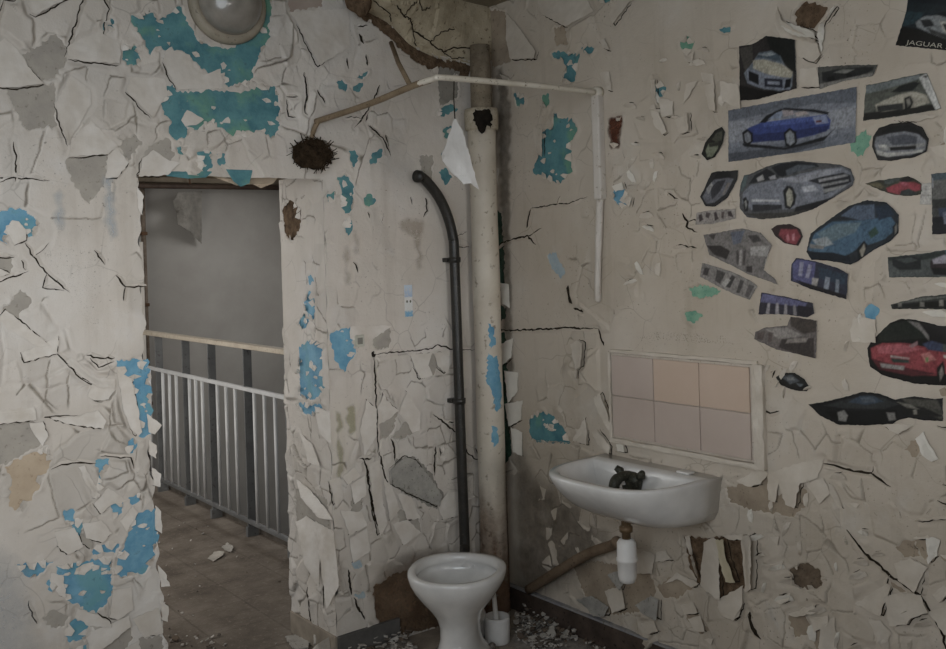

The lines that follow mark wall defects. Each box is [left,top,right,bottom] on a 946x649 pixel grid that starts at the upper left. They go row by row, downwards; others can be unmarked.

flaking render [362,13,470,77]
peeling [0,0,282,214]
corrosion [608,116,622,148]
crack [501,285,604,346]
peeling [0,357,162,513]
peeling [15,458,170,649]
peeling [296,325,391,444]
peeling [295,390,459,609]
crack [359,342,478,535]
peeling [574,533,758,644]
peeling [727,459,830,517]
crack [846,530,946,649]